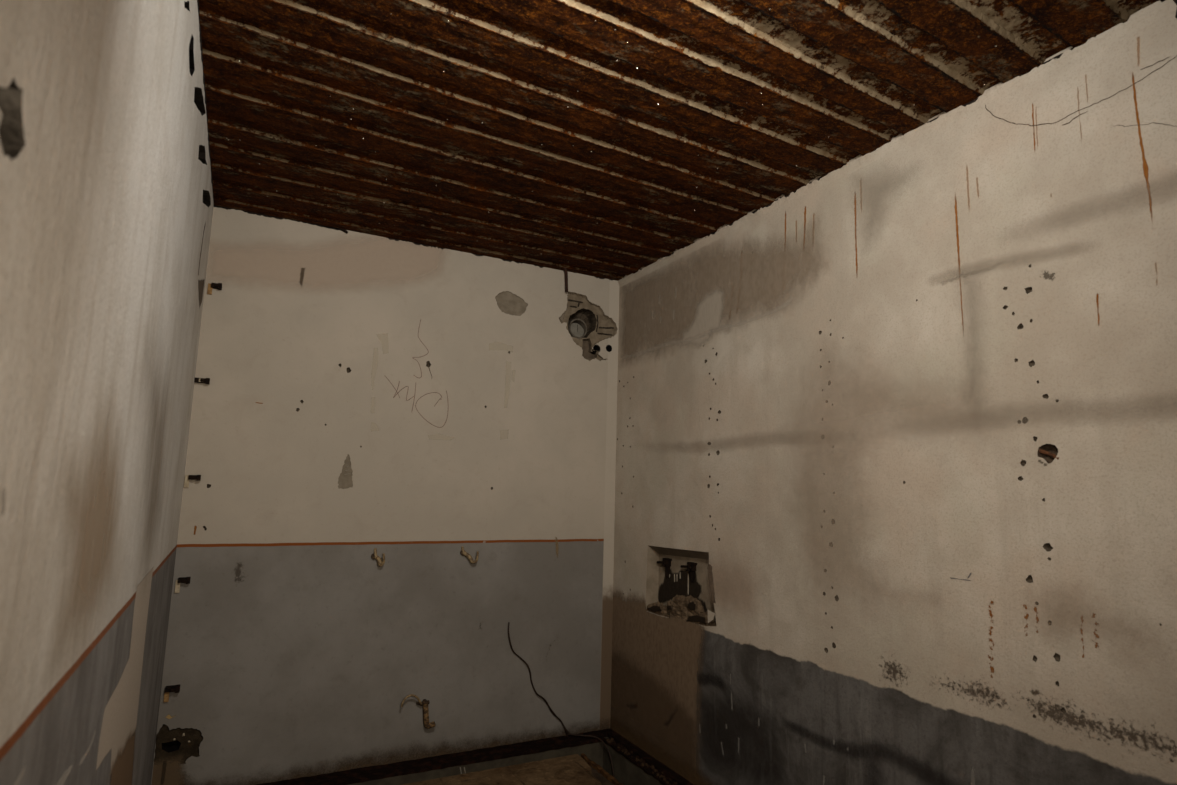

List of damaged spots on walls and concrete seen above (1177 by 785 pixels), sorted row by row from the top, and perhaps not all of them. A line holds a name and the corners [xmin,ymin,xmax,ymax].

spalling [0,77,25,161]
rust [197,0,285,220]
crack [985,56,1177,127]
rust [1132,74,1152,217]
rust [955,197,964,330]
spalling [495,291,528,316]
spalling [559,292,617,361]
spalling [338,455,353,489]
spalling [1037,444,1059,466]
damp [879,654,910,687]
spalling [154,715,203,785]
damp [935,673,1177,765]